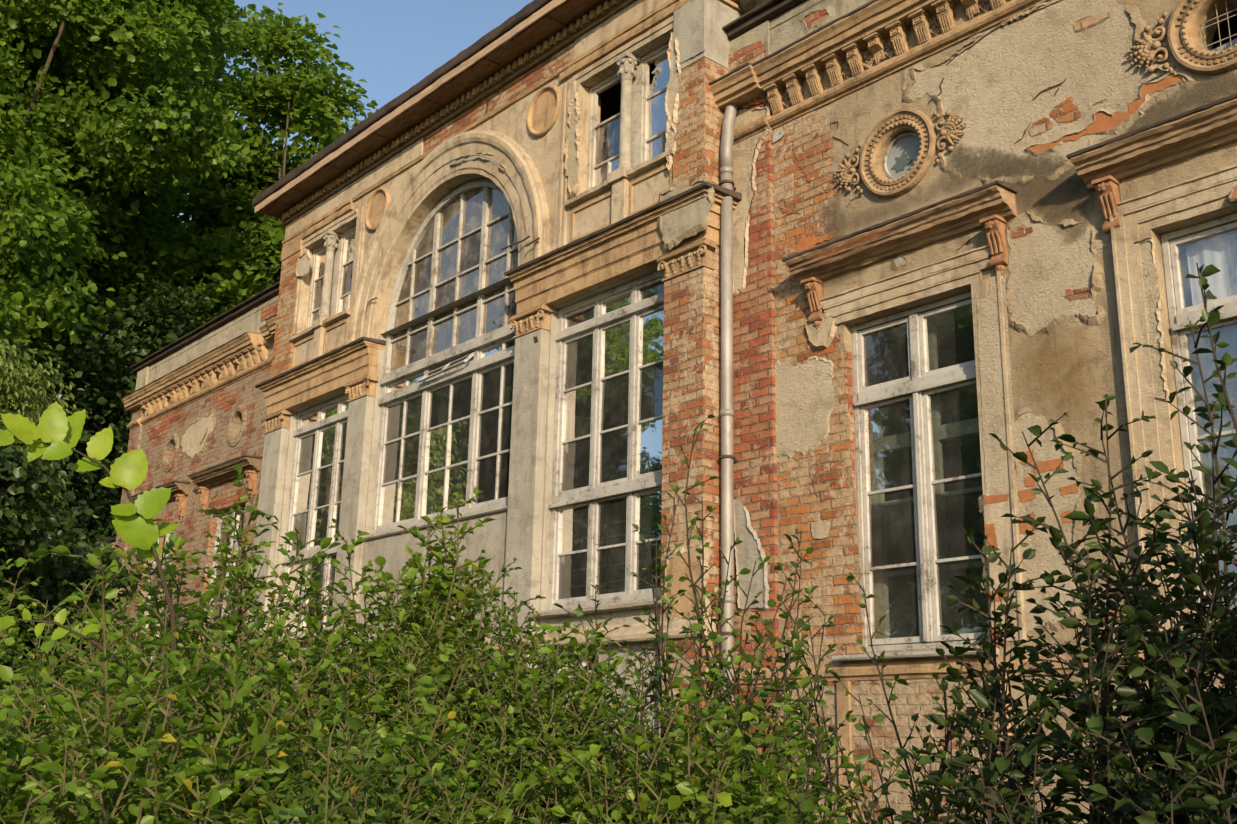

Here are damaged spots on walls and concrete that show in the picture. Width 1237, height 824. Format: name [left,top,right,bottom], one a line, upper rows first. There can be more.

spalling [665,32,681,171]
peeling [728,39,767,72]
spalling [901,0,1196,186]
spalling [657,175,715,250]
leakage [942,146,1090,237]
spalling [143,388,236,460]
flaking render [733,93,864,661]
spalling [977,208,1113,657]